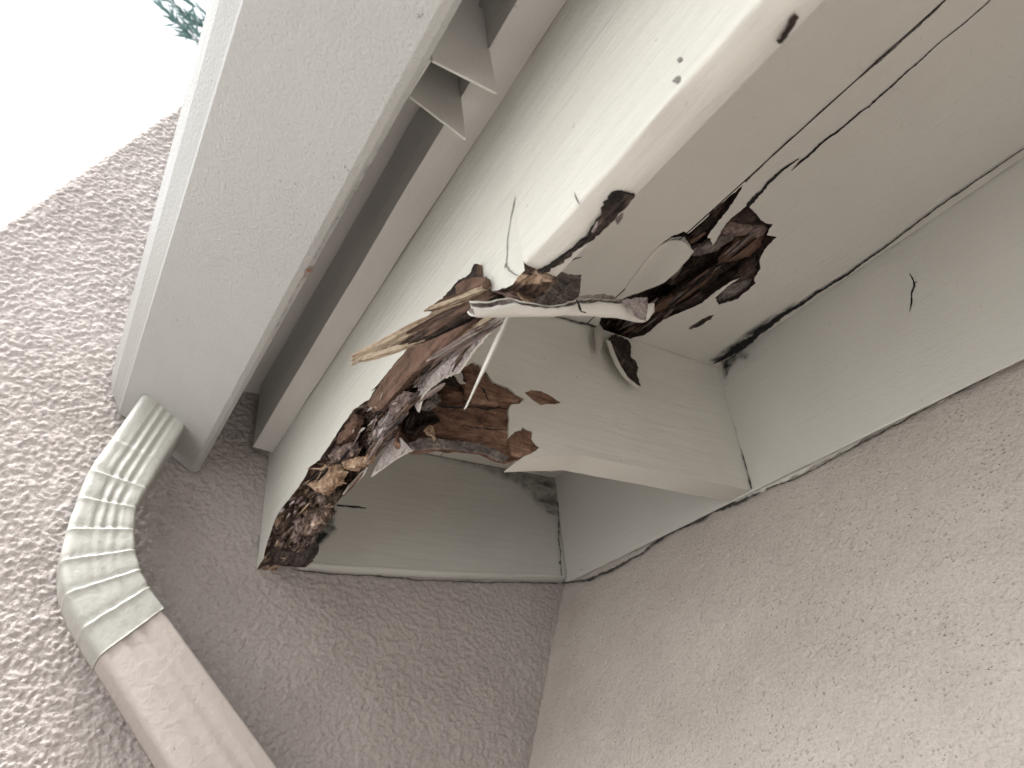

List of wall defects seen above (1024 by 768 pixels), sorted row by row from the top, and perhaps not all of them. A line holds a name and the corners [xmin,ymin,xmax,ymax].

crack [745,0,991,208]
crack [714,148,1024,364]
peeling [688,315,714,330]
water stain [713,318,777,375]
peeling [525,390,561,405]
peeling [424,425,436,442]
peeling [342,437,413,495]
crack [292,372,998,584]